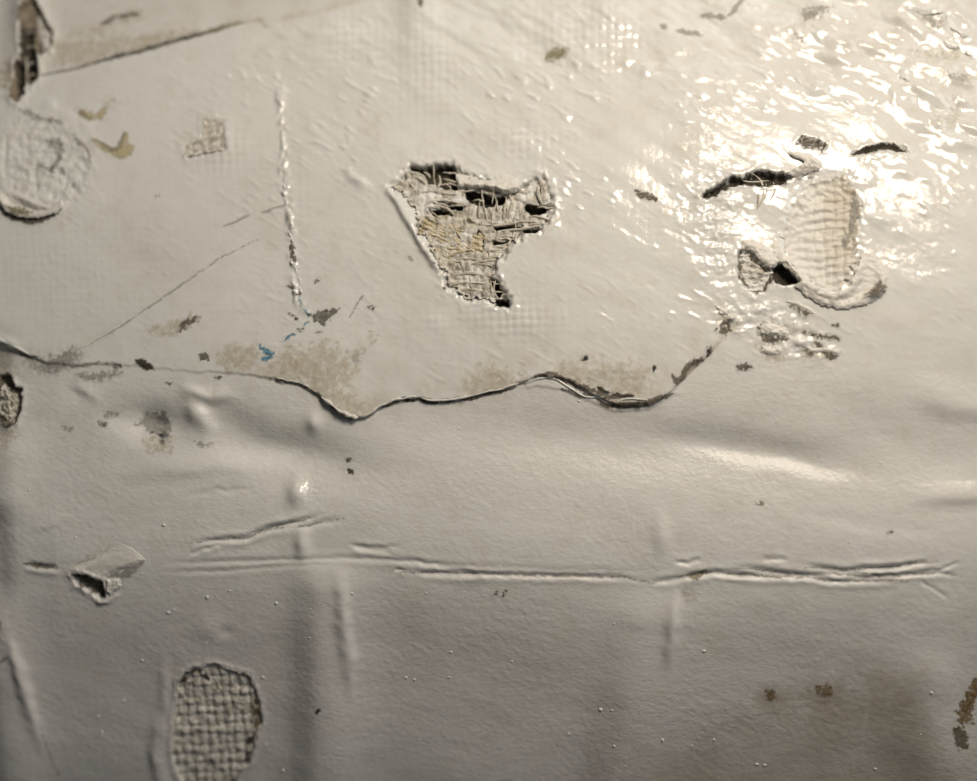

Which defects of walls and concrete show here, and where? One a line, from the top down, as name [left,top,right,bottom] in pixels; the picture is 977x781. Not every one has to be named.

spalling [429,189,509,216]
peeling [477,179,551,281]
spalling [737,239,779,293]
crack [197,517,344,542]
peeling [105,578,122,596]
crack [400,571,636,580]
crack [681,561,933,582]
peeling [172,663,263,781]
corrosion [953,678,977,751]